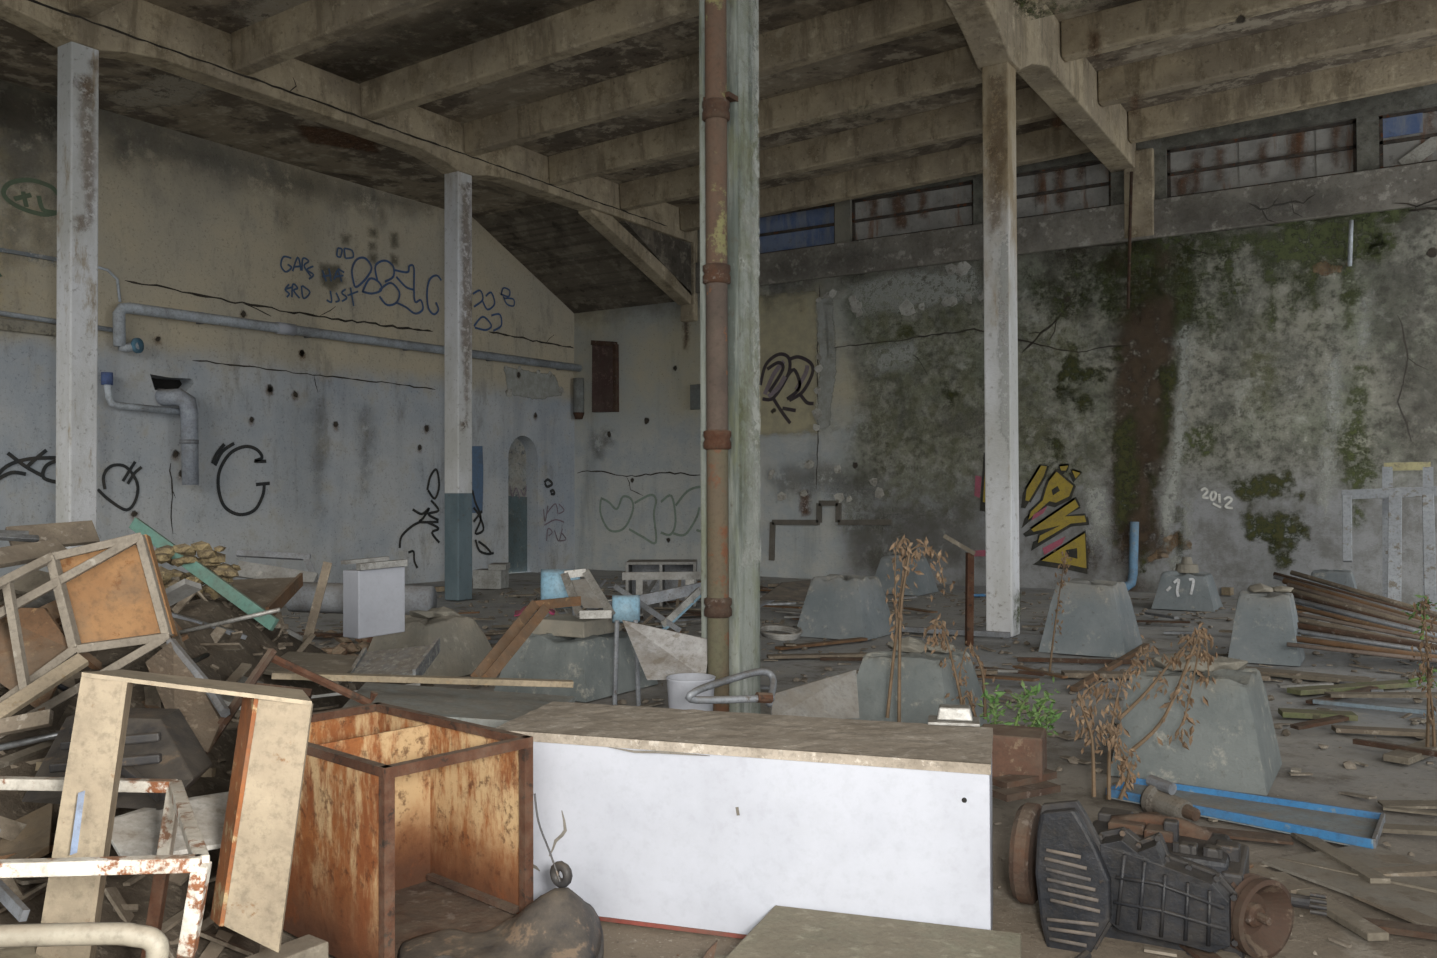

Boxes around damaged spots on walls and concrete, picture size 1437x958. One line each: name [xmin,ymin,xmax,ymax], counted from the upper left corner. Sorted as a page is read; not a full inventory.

leakage [1086,235,1200,591]